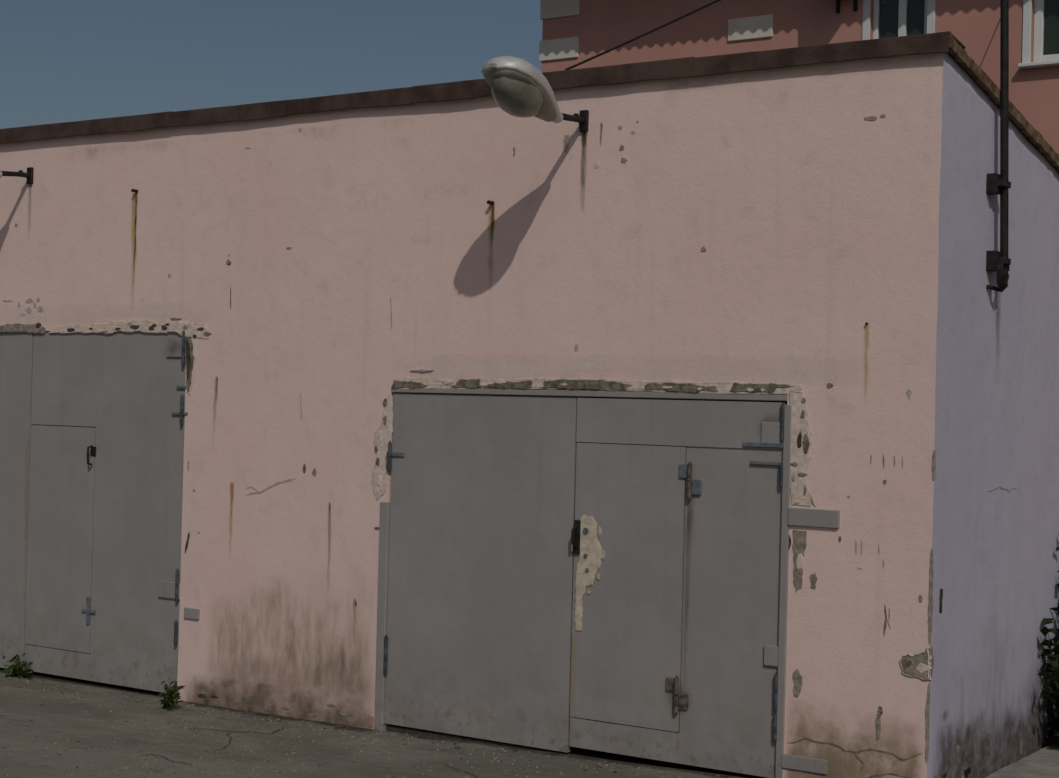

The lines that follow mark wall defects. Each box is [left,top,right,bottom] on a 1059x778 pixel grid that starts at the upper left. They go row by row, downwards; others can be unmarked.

flaking render [0,298,212,395]
flaking render [371,369,816,507]
peeling [574,515,605,631]
flaking render [789,530,818,593]
leakage [196,677,365,727]
flaking render [899,548,943,764]
leakage [791,724,916,778]
crack [789,737,922,774]